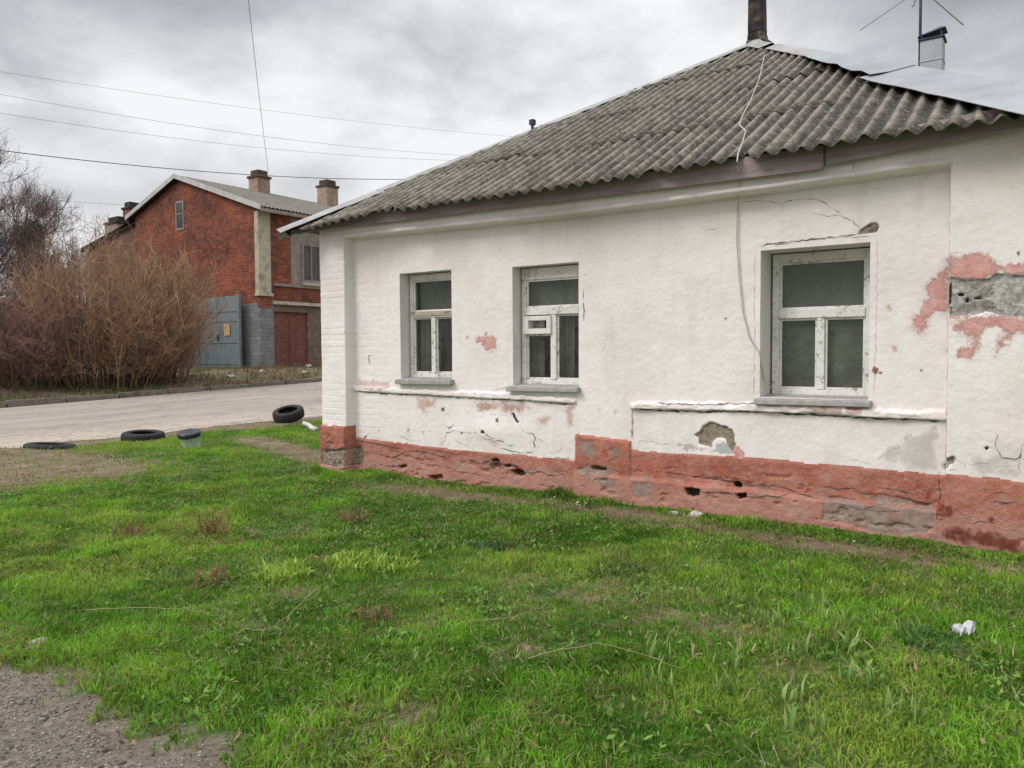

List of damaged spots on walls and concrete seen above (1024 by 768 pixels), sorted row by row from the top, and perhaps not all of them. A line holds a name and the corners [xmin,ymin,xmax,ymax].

flaking render [858,223,879,234]
peeling [913,251,1024,359]
peeling [466,332,496,353]
crack [631,194,1022,532]
crack [323,425,564,476]
flaking render [695,422,736,451]
flaking render [823,493,952,536]